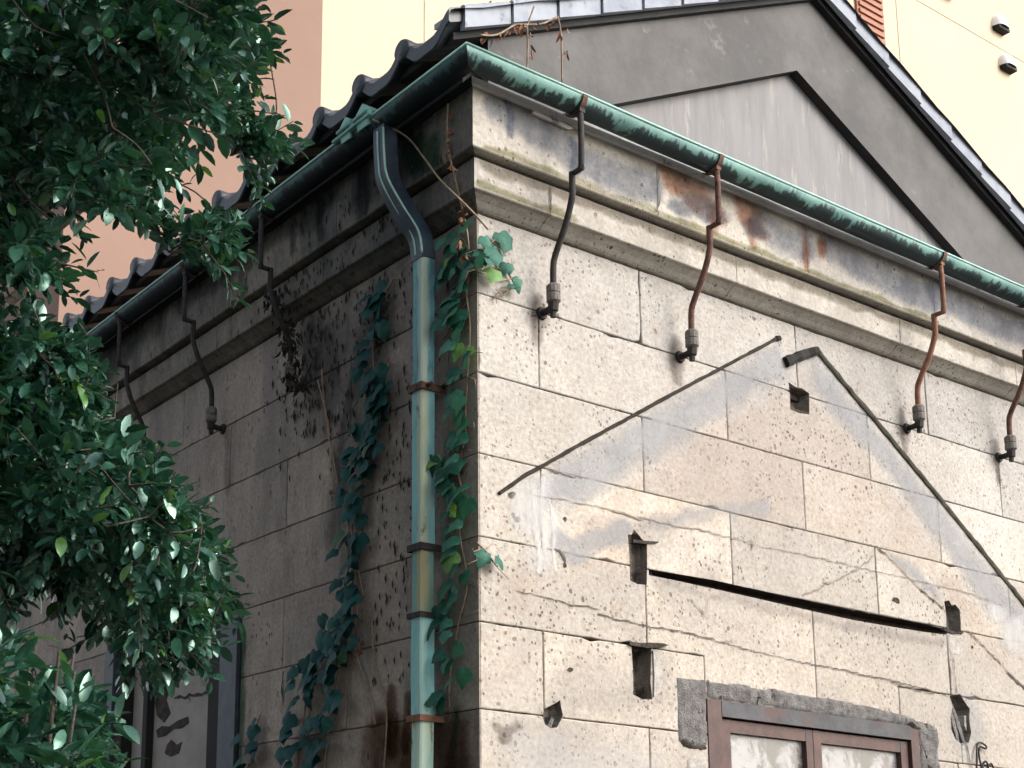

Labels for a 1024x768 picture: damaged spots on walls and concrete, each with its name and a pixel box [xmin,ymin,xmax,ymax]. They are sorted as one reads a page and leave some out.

damp [514,345,787,573]
crack [528,469,1003,610]
crack [516,590,958,696]